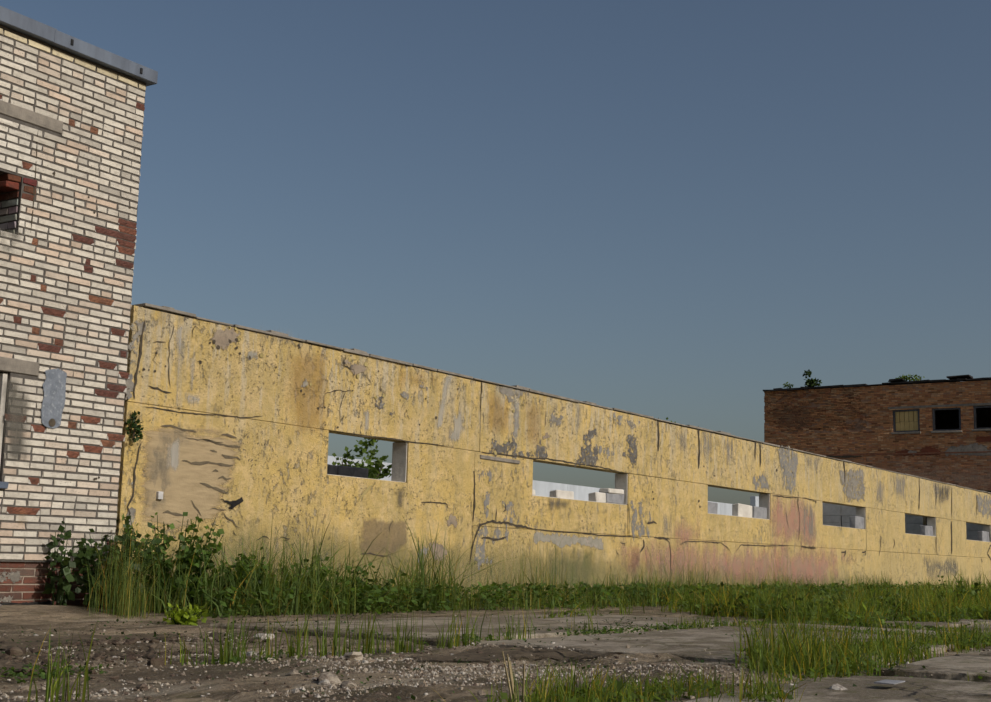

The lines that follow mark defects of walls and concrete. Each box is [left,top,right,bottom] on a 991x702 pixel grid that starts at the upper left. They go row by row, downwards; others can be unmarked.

spalling [162,425,243,528]
peeling [474,467,519,570]
peeling [489,386,563,460]
peeling [534,530,604,551]
peeling [574,413,640,467]
crack [469,452,815,564]
crack [695,426,703,469]
crack [826,455,863,481]
peeling [839,468,865,503]